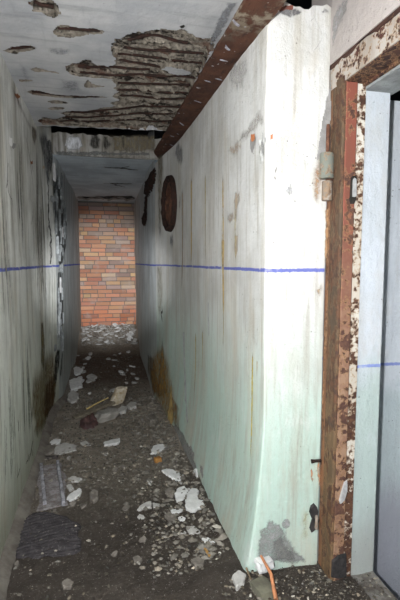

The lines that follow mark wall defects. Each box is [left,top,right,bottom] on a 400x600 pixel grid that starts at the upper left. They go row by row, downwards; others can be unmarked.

spalling [3,45,35,54]
spalling [28,0,61,18]
spalling [27,25,221,131]
leakage [36,135,49,296]
peeling [48,140,149,393]